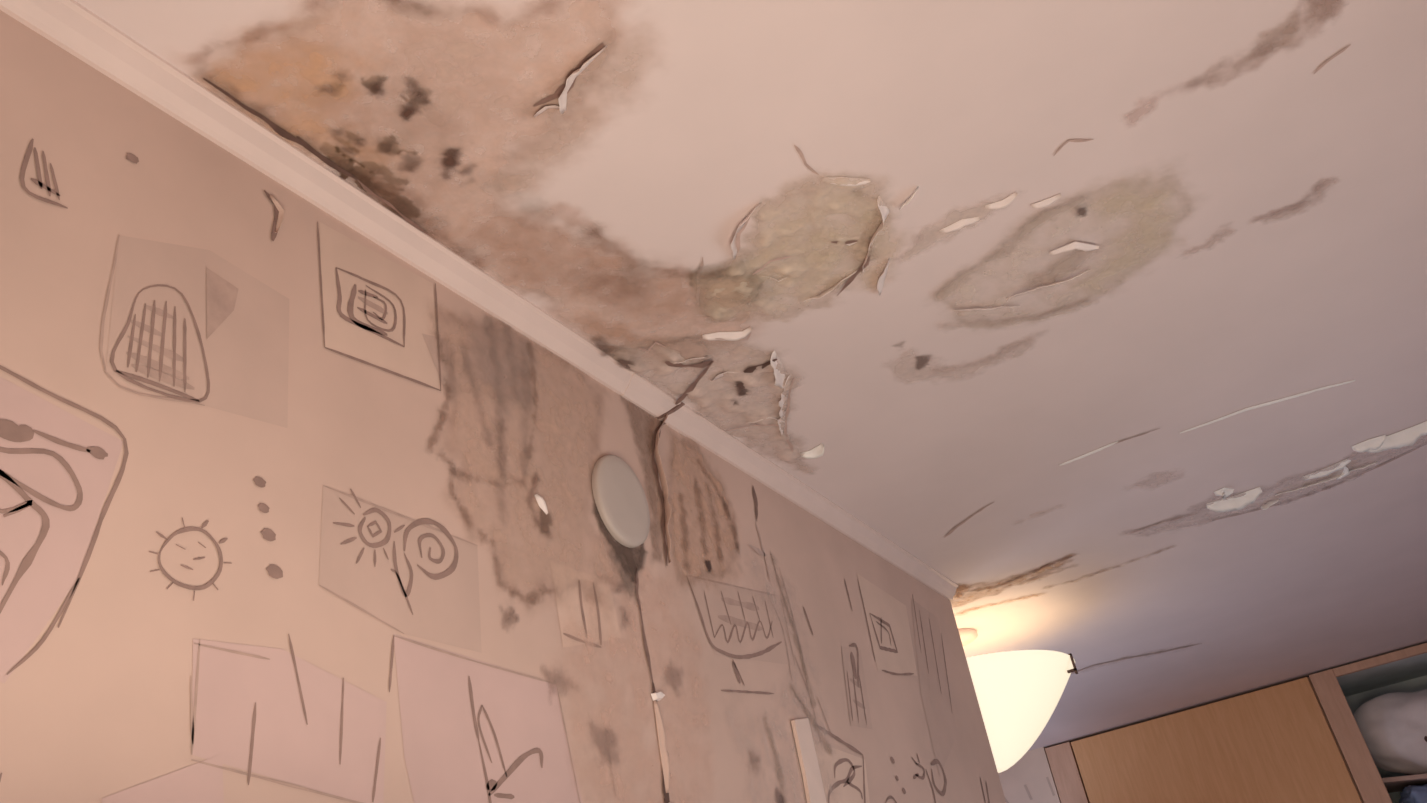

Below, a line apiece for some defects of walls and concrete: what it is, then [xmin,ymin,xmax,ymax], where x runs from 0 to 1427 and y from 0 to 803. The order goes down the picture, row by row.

peeling [533,43,607,117]
water stain [250,0,746,356]
flaking render [596,145,1061,469]
water stain [449,452,574,542]
water stain [628,402,736,575]
peeling [1131,421,1427,533]
crack [635,568,670,803]